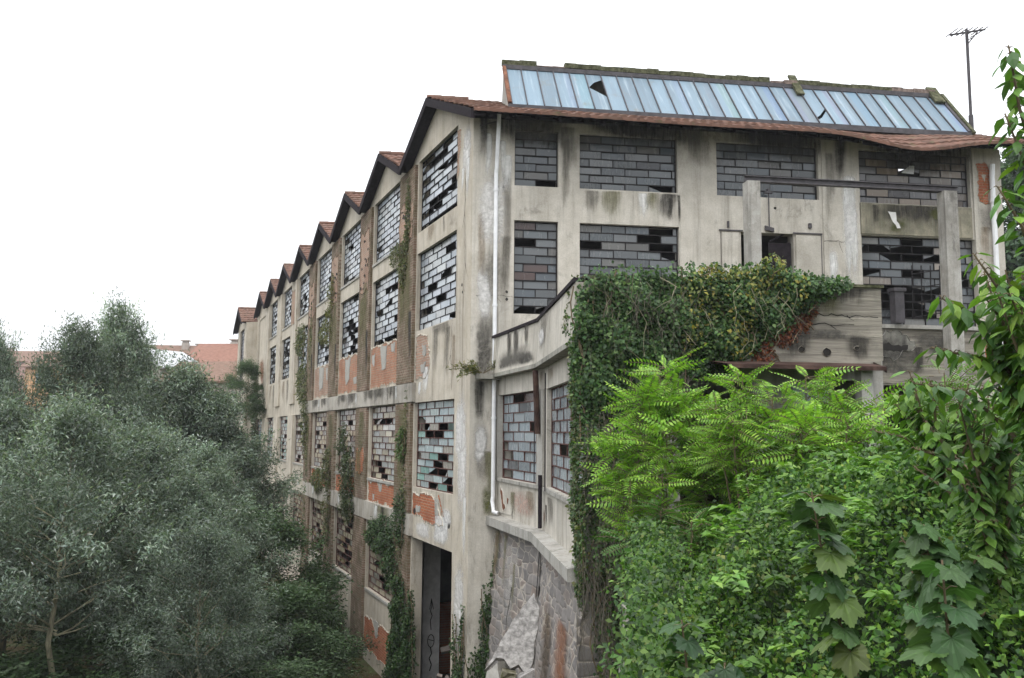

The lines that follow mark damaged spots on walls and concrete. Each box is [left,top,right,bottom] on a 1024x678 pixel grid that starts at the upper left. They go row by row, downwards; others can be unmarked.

leakage [639,193,680,217]
flaking render [975,162,990,205]
leakage [417,115,544,545]
crack [811,313,878,329]
flaking render [314,353,357,399]
flaking render [370,338,397,390]
flaking render [311,446,394,508]
flaking render [412,491,450,529]
flaking render [363,615,390,667]